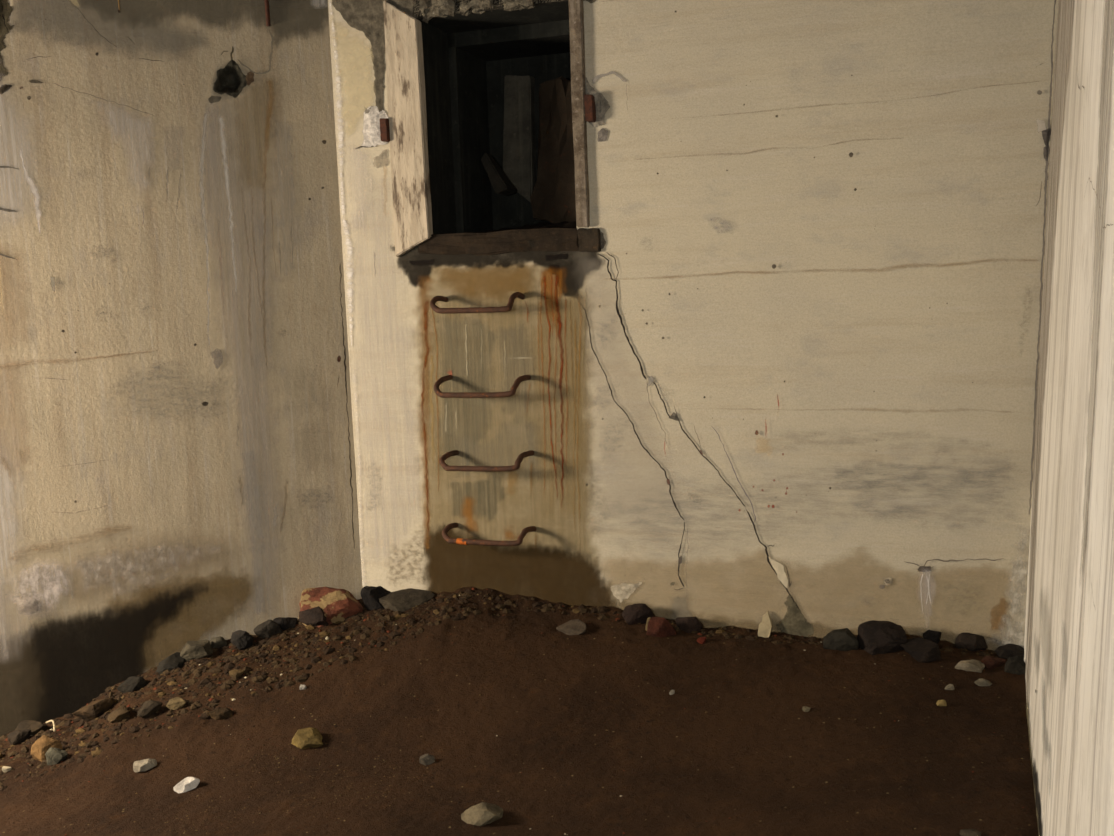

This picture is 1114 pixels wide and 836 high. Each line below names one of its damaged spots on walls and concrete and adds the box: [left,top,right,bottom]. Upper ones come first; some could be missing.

spalling [0,0,43,100]
spalling [69,0,424,112]
spalling [585,71,626,142]
water stain [0,98,40,232]
corrosion [424,305,452,378]
corrosion [423,424,439,527]
corrosion [527,270,582,523]
crack [579,252,814,637]
water stain [425,527,642,607]
water stain [0,564,250,737]
water stain [653,611,781,633]